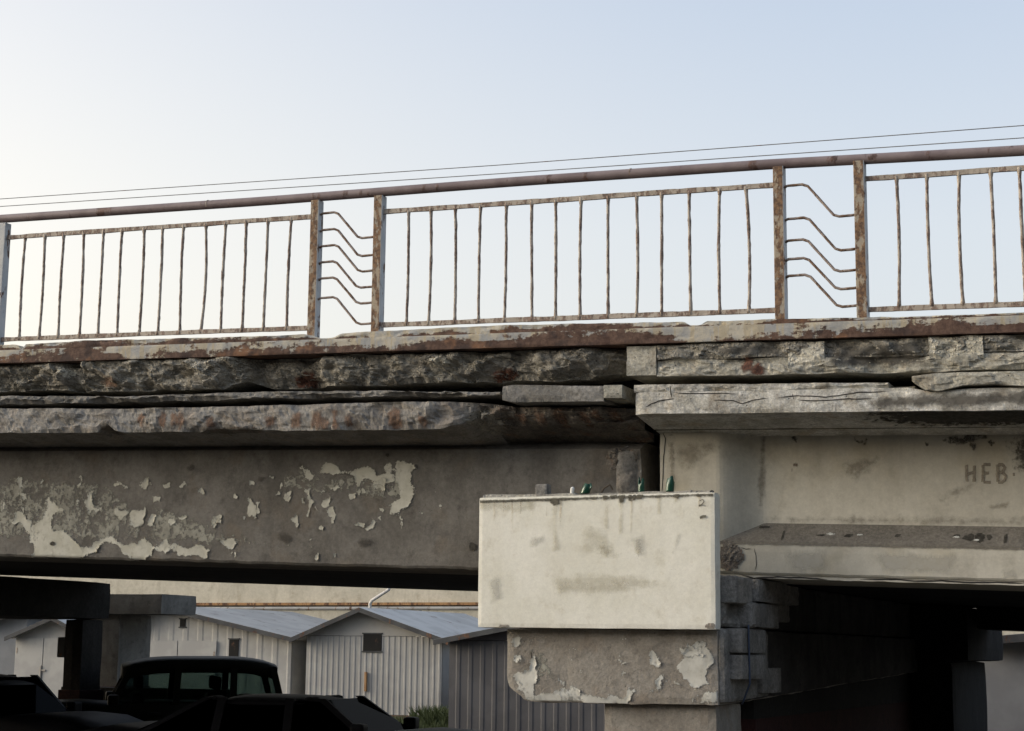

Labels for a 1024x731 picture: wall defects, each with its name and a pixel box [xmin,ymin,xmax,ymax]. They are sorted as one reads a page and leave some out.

peeling [0,475,265,561]
peeling [269,453,424,531]
peeling [499,623,717,704]